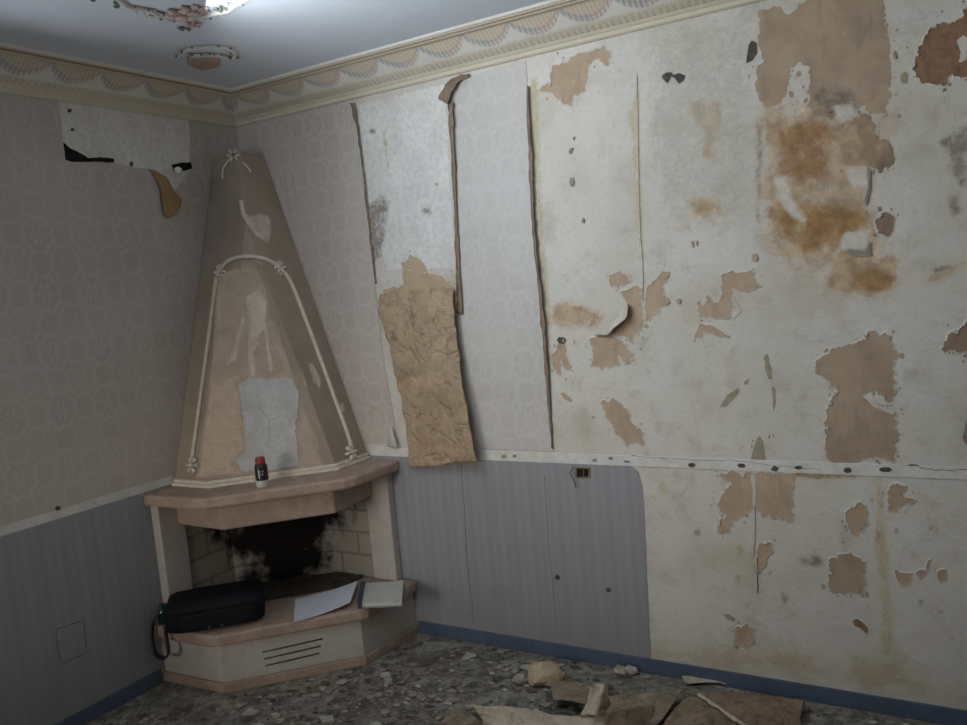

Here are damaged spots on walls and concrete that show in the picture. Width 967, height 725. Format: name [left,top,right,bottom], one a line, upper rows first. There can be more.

flaking render [58,101,191,190]
peeling [536,44,614,111]
water stain [759,92,895,297]
peeling [746,0,967,256]
peeling [589,264,671,371]
peeling [592,396,646,448]
peeling [813,329,904,465]
peeling [710,434,798,538]